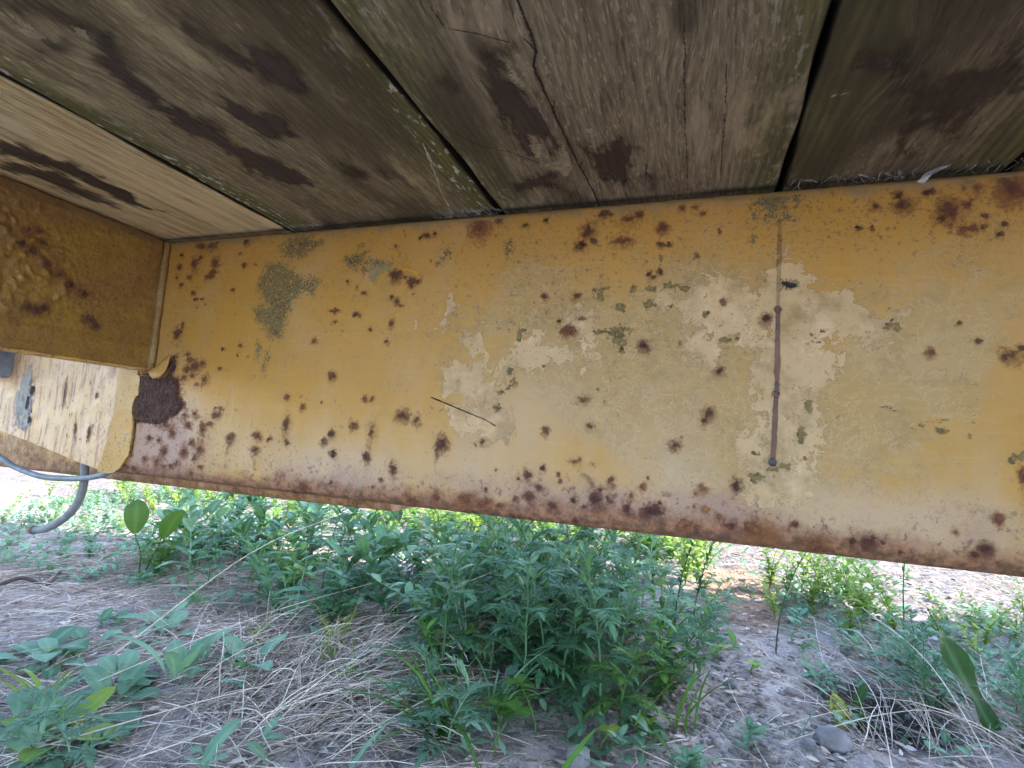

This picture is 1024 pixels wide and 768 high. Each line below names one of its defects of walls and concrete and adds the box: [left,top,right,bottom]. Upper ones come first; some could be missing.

water stain [0,140,163,212]
water stain [93,22,314,186]
crack [430,0,600,207]
water stain [479,48,560,156]
water stain [583,136,633,186]
crack [681,24,689,190]
crack [719,64,727,181]
rust [938,184,1008,236]
peeling [432,292,604,449]
peeling [650,238,913,514]
rust [513,465,545,501]
rust [571,477,663,517]